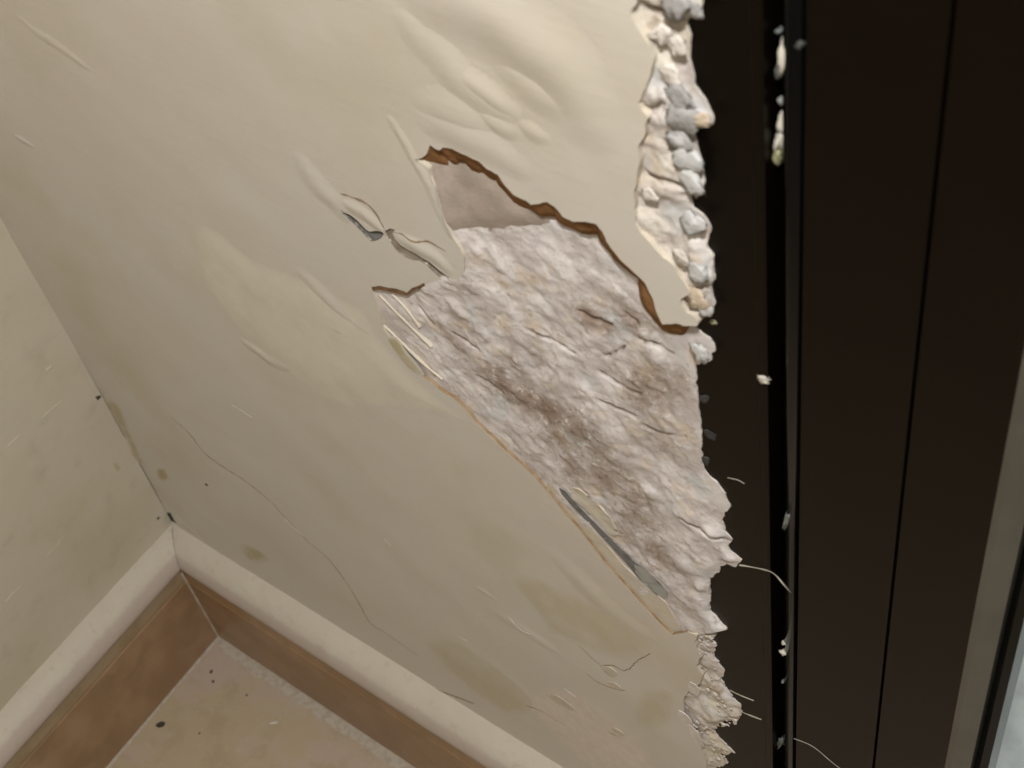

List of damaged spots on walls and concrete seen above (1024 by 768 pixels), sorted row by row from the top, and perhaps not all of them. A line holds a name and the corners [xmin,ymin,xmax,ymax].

flaking render [375,0,743,768]
crack [584,650,651,691]